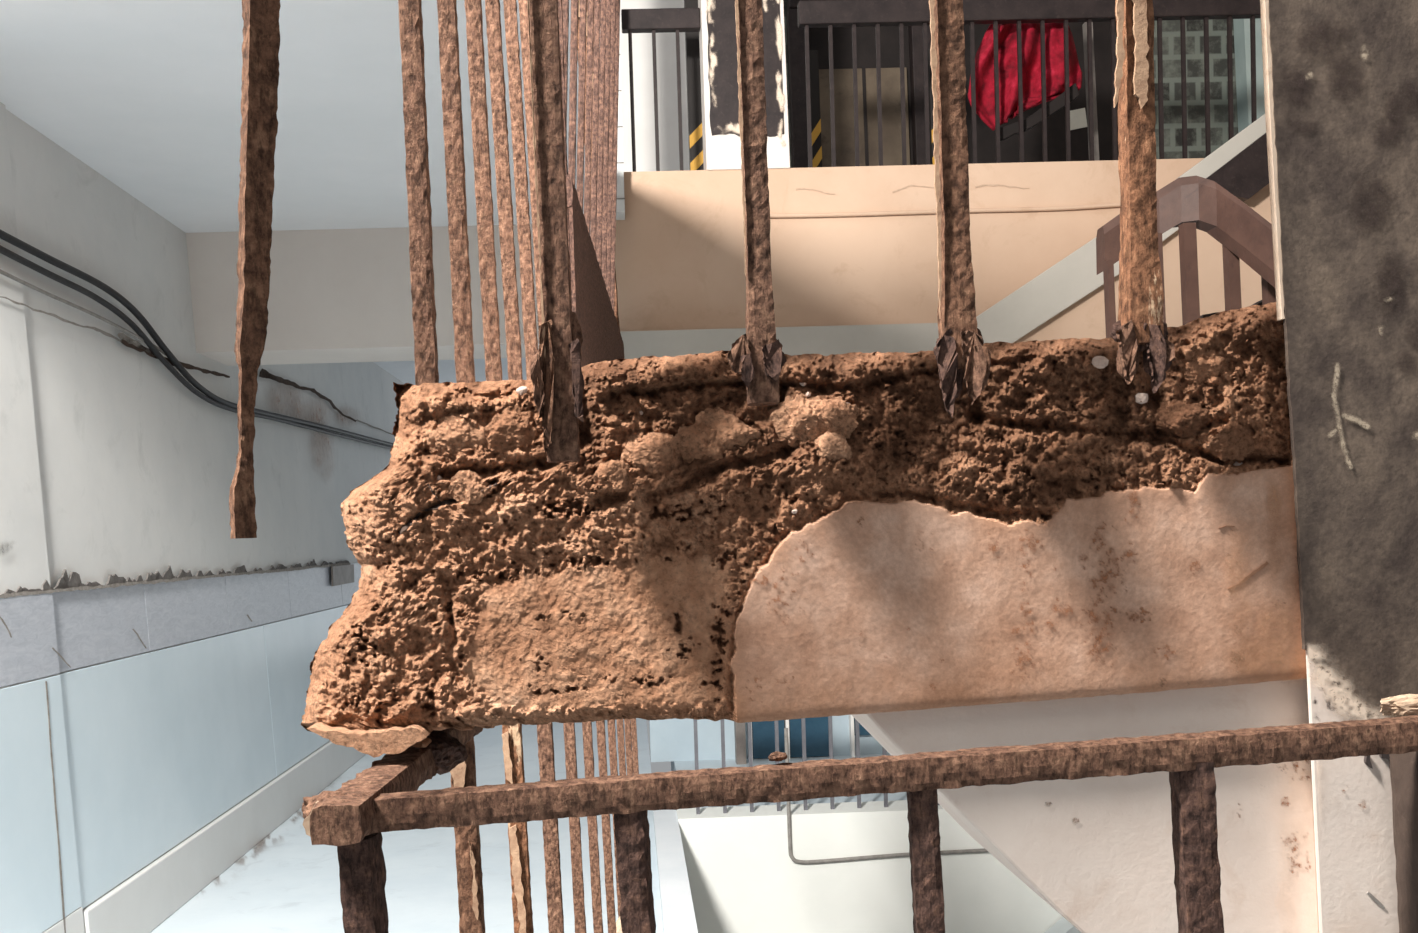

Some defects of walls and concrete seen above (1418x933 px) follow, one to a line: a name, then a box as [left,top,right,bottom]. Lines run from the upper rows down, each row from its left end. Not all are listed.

crack [0,296,393,435]
corrosion [530,320,585,452]
corrosion [727,334,783,389]
corrosion [936,328,987,418]
corrosion [1116,320,1176,393]
spalling [0,302,1293,757]
corrosion [303,801,319,836]